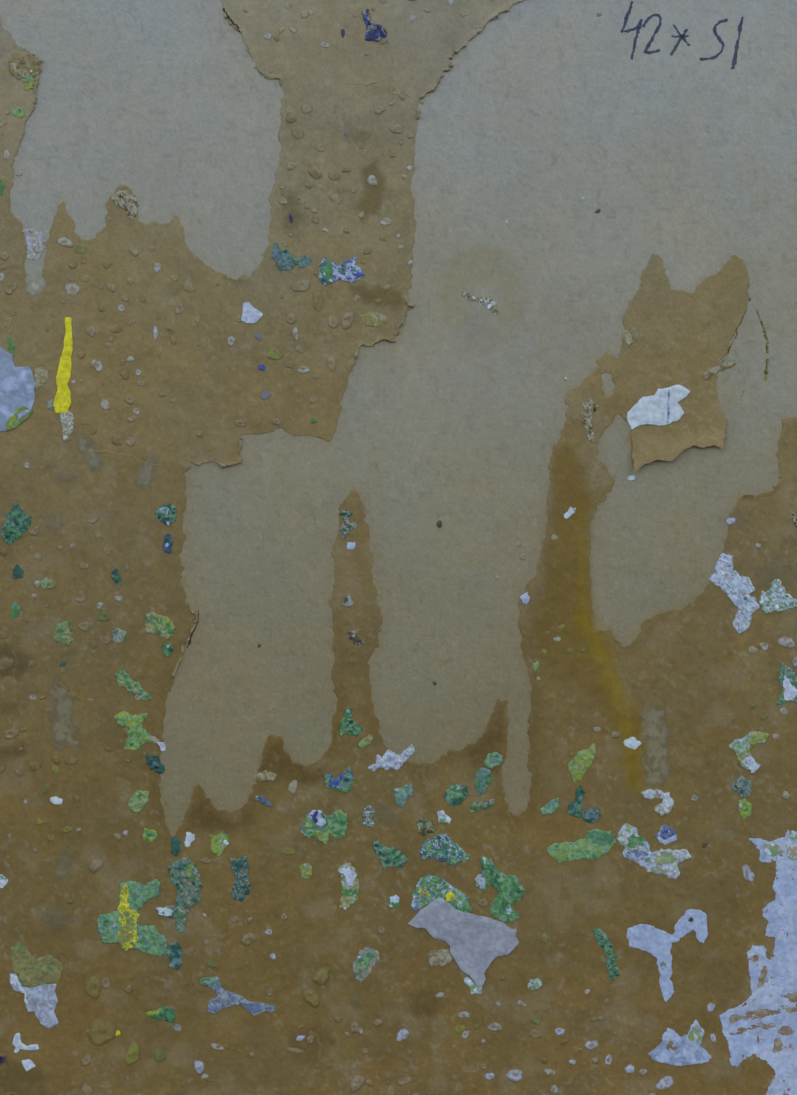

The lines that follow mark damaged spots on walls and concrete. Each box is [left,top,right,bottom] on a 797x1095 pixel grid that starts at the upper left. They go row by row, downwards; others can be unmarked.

peeling [0,0,364,285]
peeling [97,0,797,994]
peeling [200,977,275,1016]